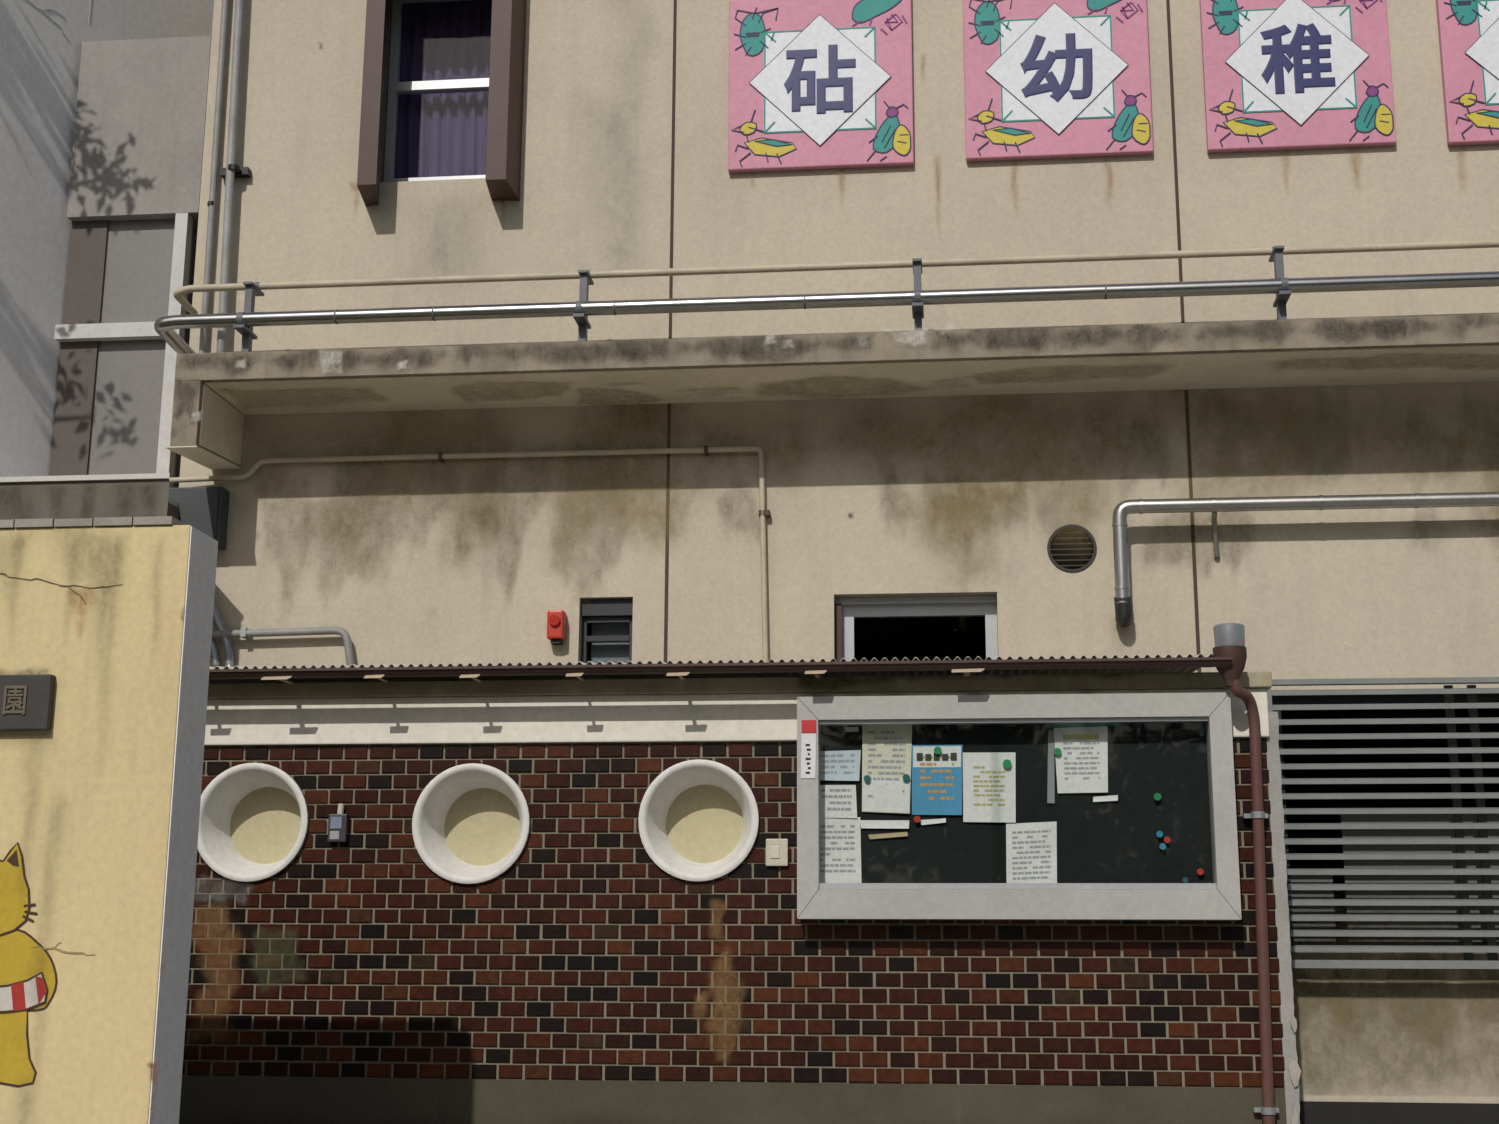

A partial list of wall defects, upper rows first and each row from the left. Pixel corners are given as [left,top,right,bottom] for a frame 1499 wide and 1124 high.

crack [27,0,70,43]
crack [0,573,123,605]